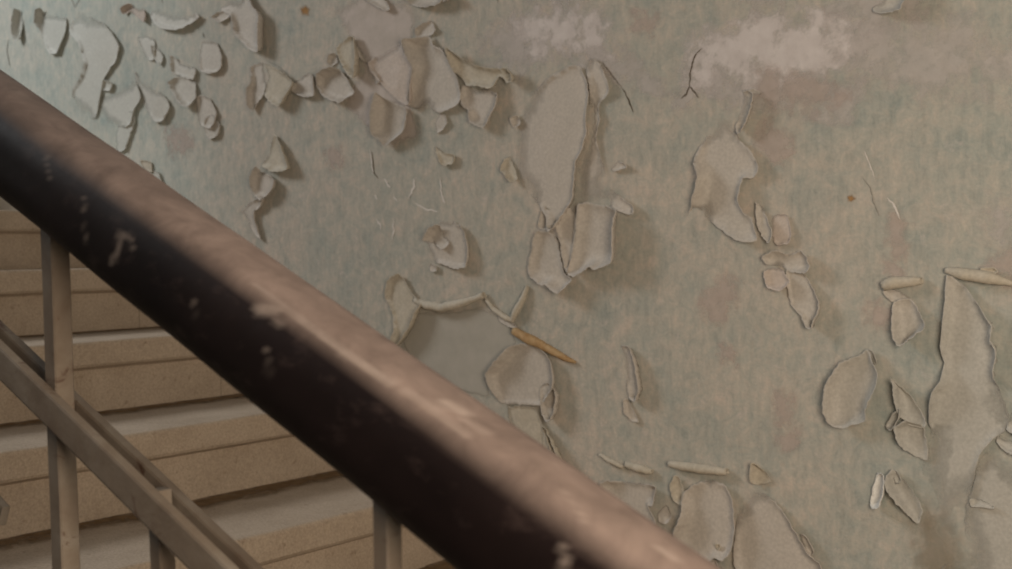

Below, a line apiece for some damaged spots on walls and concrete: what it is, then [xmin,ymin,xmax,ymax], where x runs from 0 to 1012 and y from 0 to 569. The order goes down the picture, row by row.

peeling [7,8,223,152]
peeling [120,0,514,146]
crack [681,48,702,99]
peeling [243,134,291,240]
peeling [384,58,634,458]
peeling [686,126,821,329]
peeling [822,349,878,429]
peeling [880,267,1012,569]
peeling [598,453,823,569]
peeling [870,469,923,524]